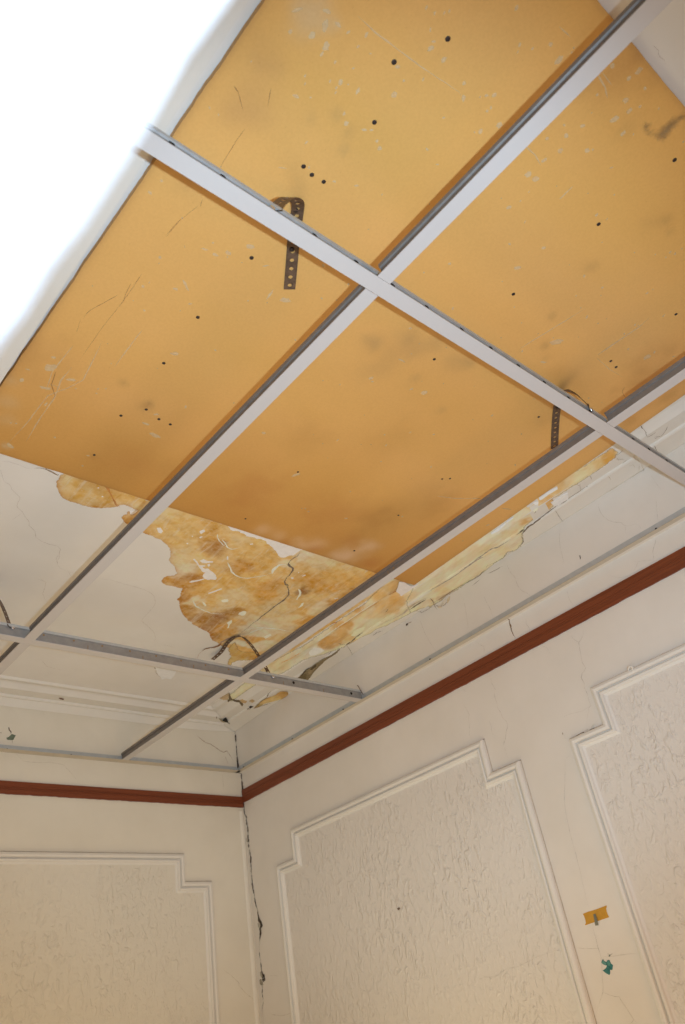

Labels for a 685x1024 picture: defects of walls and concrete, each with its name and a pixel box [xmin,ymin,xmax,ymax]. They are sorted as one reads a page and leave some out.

peeling [49,469,150,525]
peeling [143,507,380,661]
spalling [298,649,340,680]
peeling [396,582,419,596]
damp [260,449,617,674]
crack [200,734,265,1012]